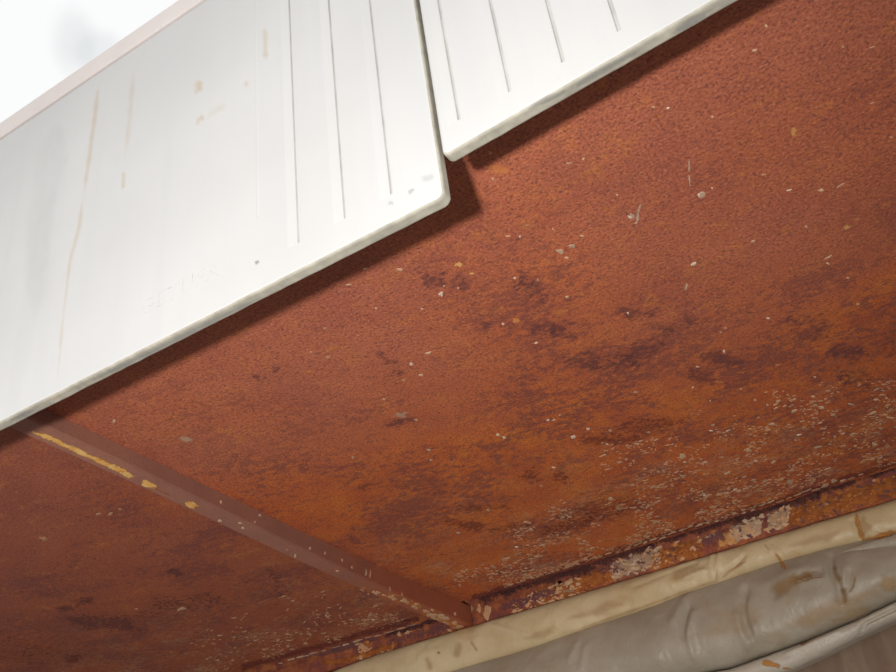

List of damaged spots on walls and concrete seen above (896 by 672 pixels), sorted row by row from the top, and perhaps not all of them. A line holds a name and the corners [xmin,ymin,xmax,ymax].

rust [32,431,169,495]
peeling [453,376,896,613]
rust [471,461,896,611]
rust [241,617,450,672]